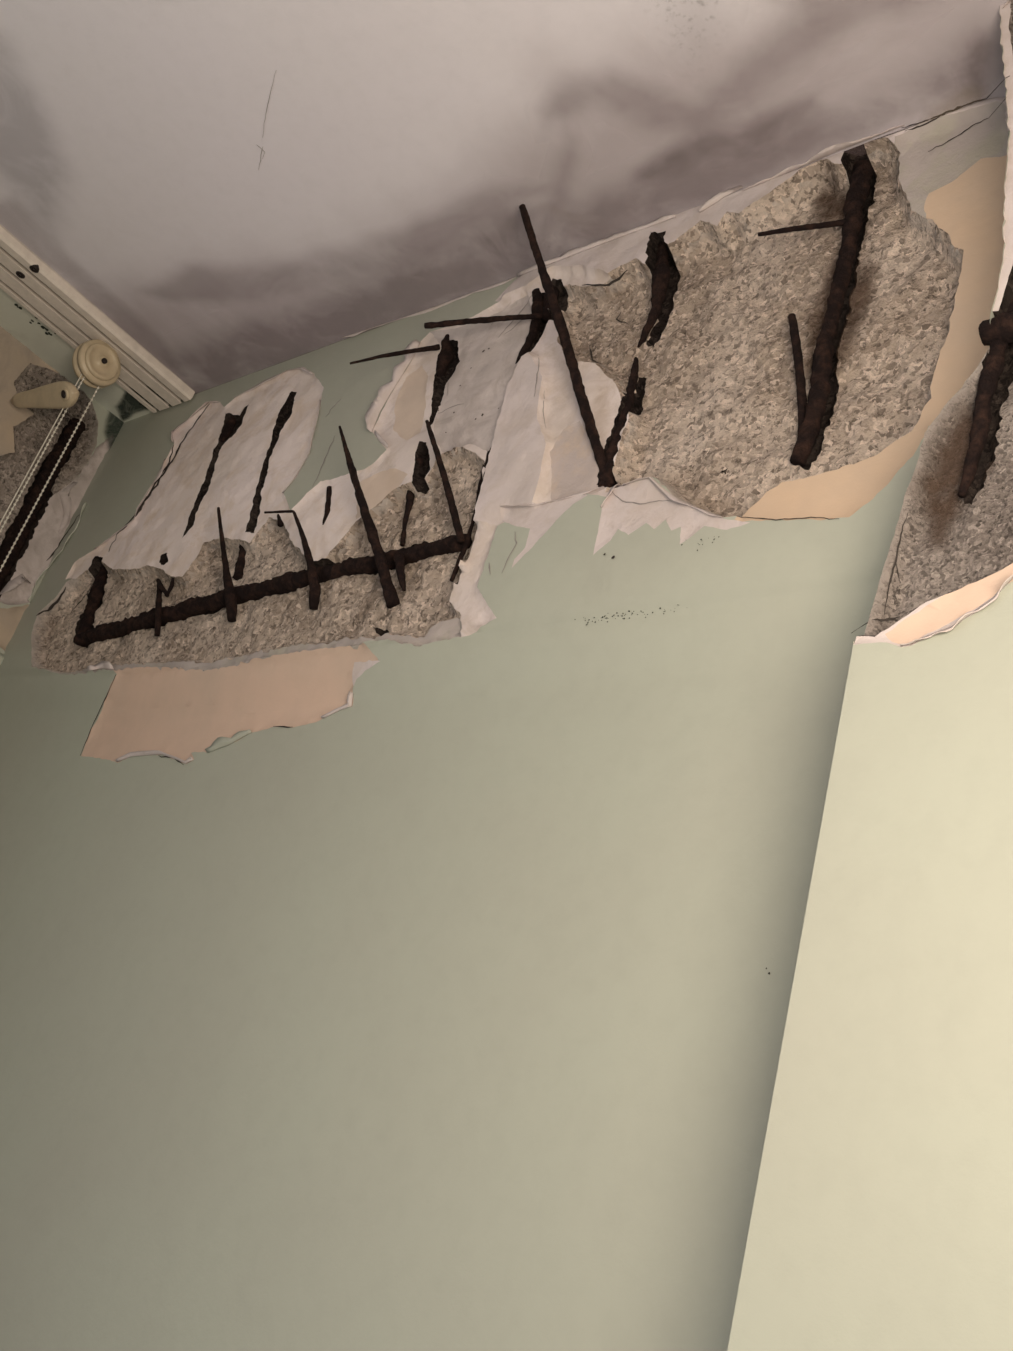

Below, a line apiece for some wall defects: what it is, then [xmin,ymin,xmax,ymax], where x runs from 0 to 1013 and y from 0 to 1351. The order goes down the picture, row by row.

corrosion [816,190,846,219]
corrosion [810,258,838,363]
corrosion [837,267,873,358]
spalling [0,0,1013,764]